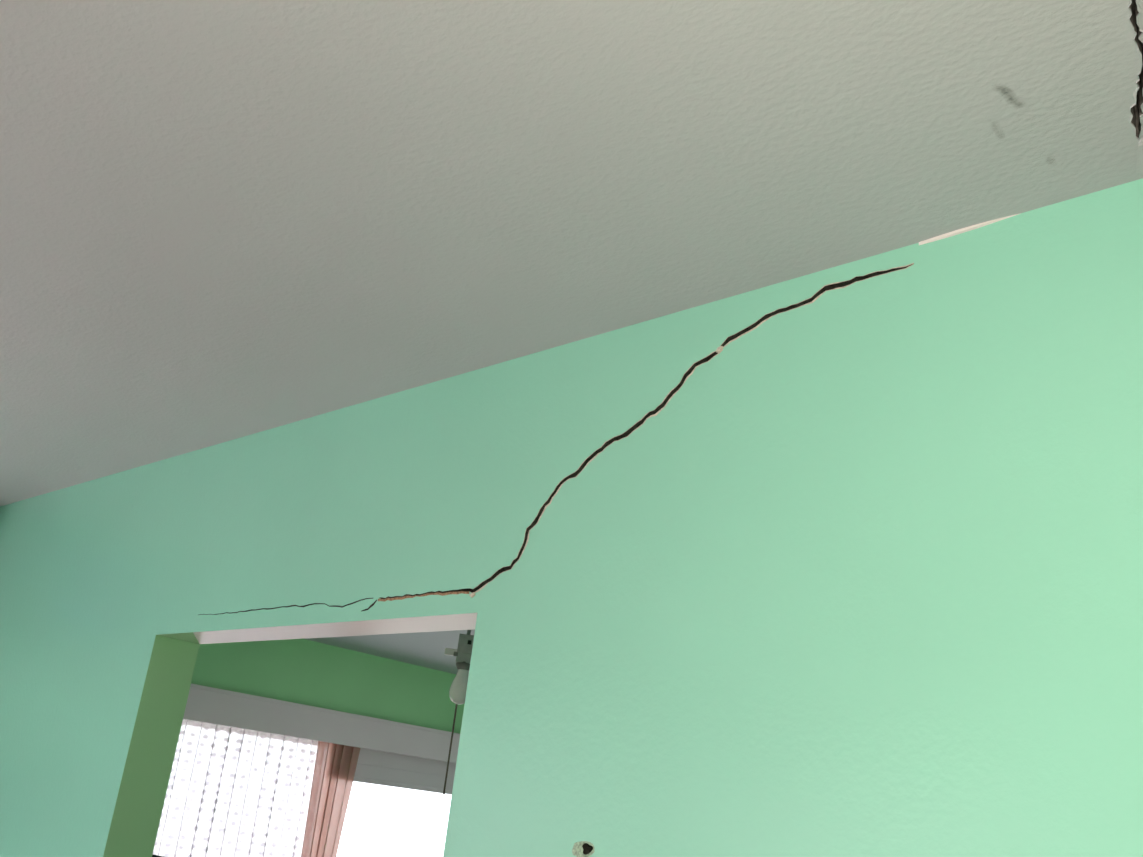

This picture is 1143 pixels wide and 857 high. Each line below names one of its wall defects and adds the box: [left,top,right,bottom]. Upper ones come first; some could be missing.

crack [1128,0,1143,140]
crack [199,263,914,615]